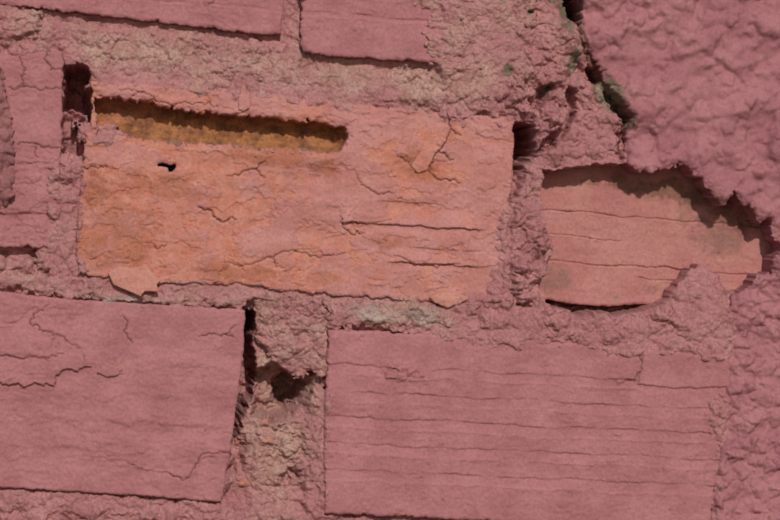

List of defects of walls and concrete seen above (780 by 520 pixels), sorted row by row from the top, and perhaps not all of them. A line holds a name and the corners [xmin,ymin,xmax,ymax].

crack [565,6,638,154]
spalling [89,91,347,155]
crack [402,106,459,182]
crack [225,250,344,267]
peeling [0,326,89,387]